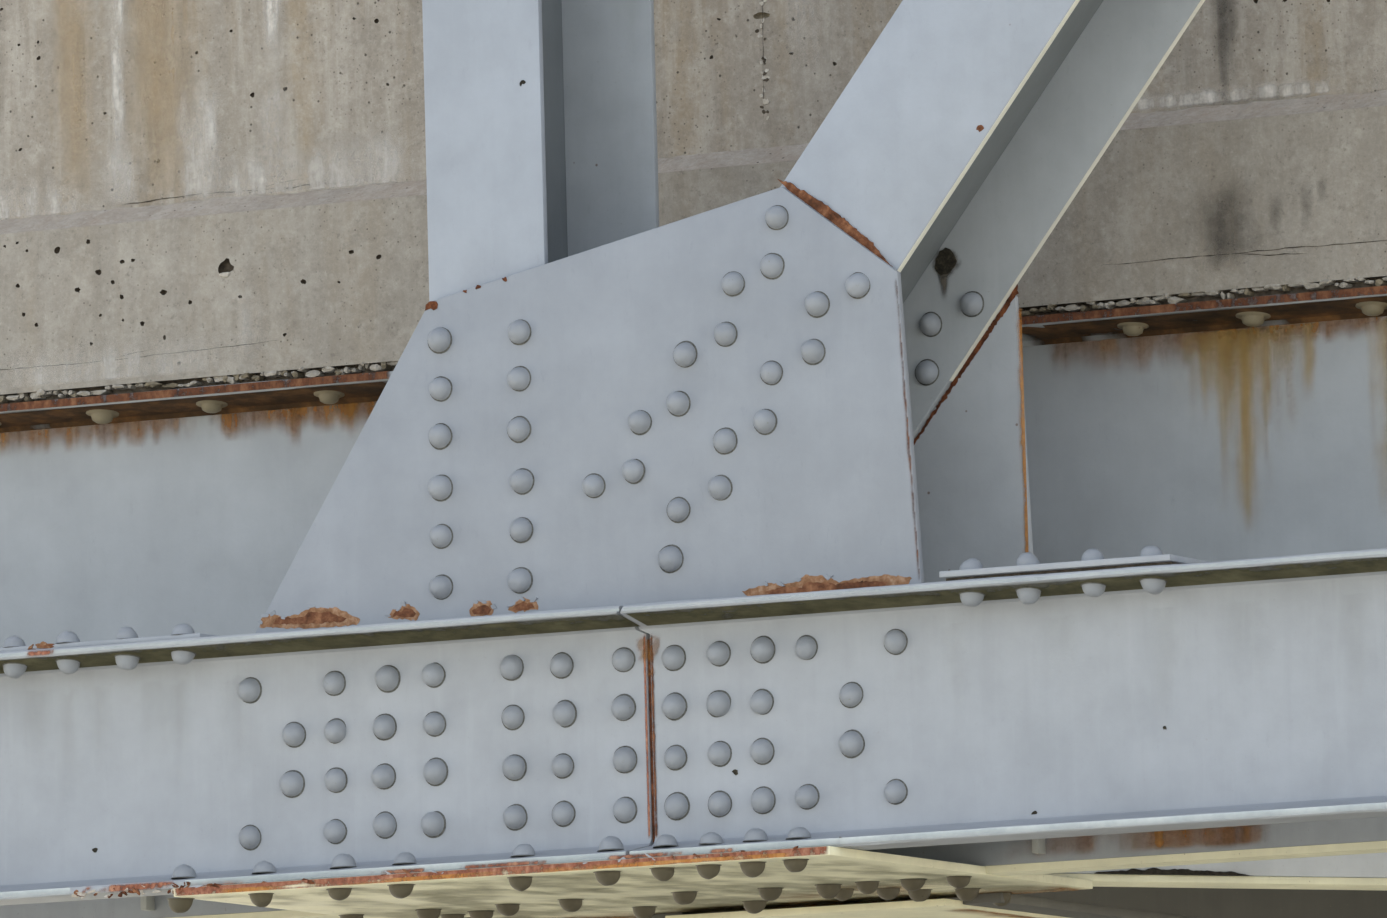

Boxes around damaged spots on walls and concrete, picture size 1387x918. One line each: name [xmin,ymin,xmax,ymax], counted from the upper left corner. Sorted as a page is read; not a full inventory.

rust [778,179,893,267]
crack [1106,240,1387,265]
rust [0,371,388,445]
rust [900,284,1387,562]
rust [72,636,827,899]